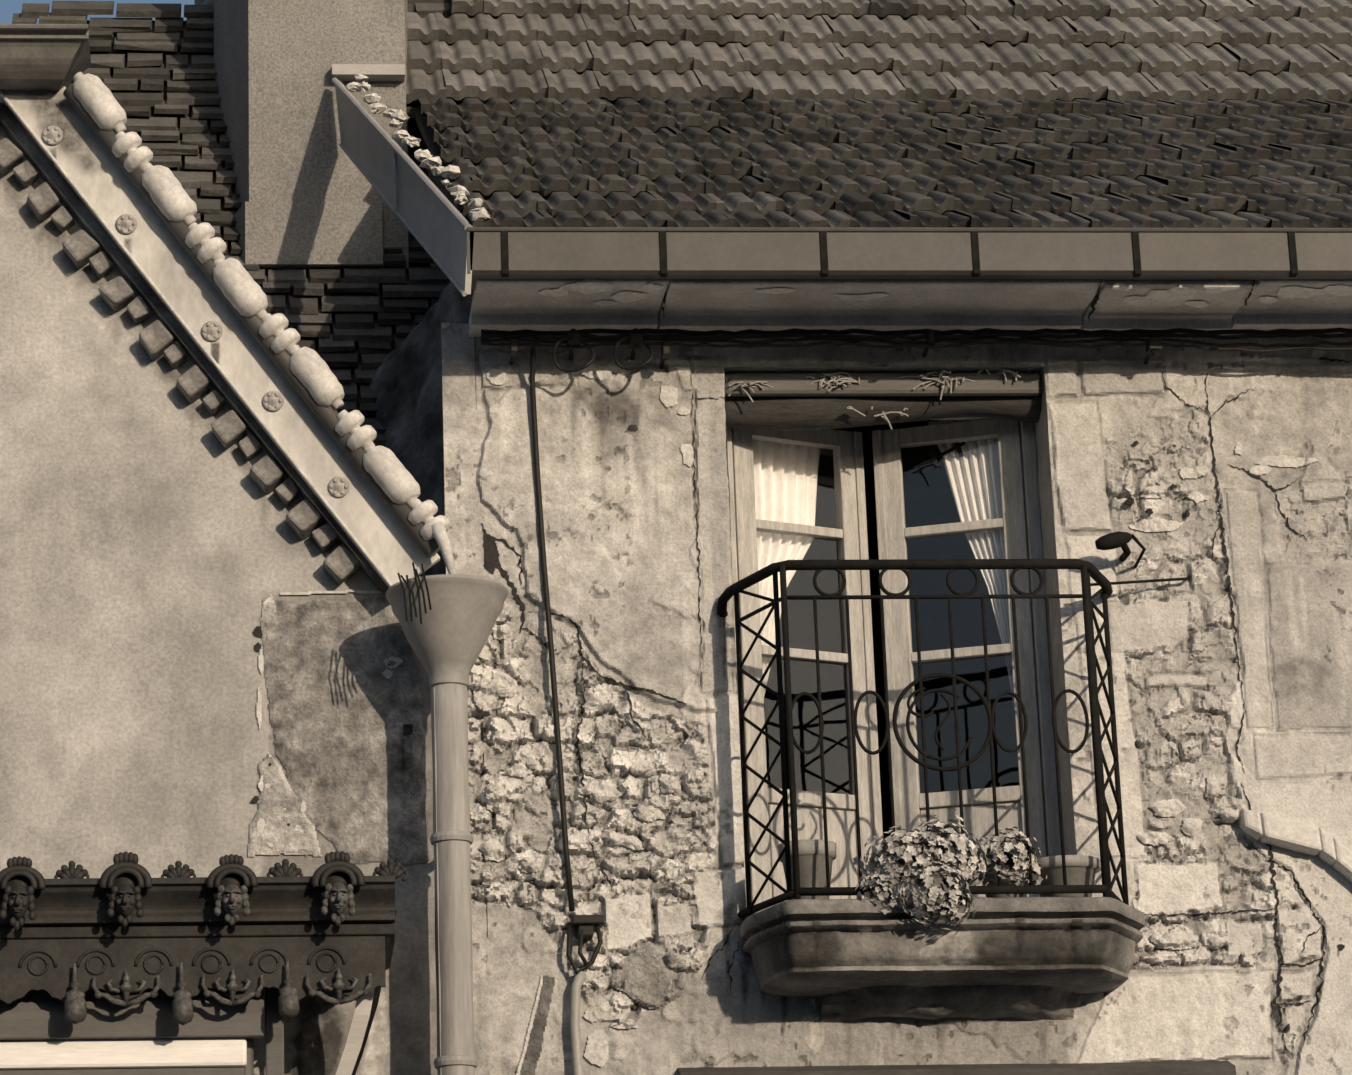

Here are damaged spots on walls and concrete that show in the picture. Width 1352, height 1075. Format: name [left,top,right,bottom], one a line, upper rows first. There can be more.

crack [1088,280,1102,321]
crack [1319,356,1352,364]
spalling [1124,465,1211,532]
peeling [1250,455,1319,475]
crack [481,360,725,891]
spalling [473,624,519,713]
peeling [248,590,430,865]
crack [1144,368,1326,1059]
spalling [607,834,647,850]
spalling [578,761,681,822]
spalling [1138,799,1203,846]
spalling [516,975,555,1075]